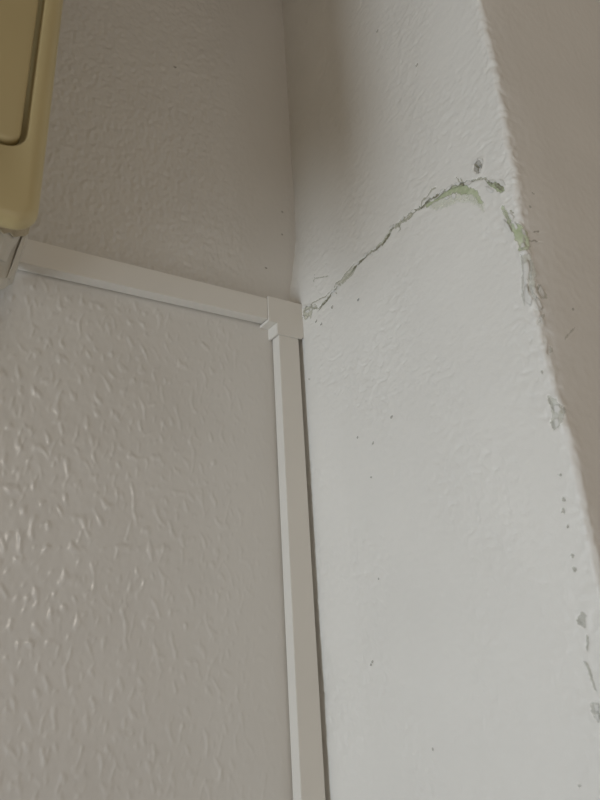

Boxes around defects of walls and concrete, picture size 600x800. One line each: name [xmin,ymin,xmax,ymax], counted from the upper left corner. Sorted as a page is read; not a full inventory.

crack [303,164,503,314]
spalling [501,206,547,324]